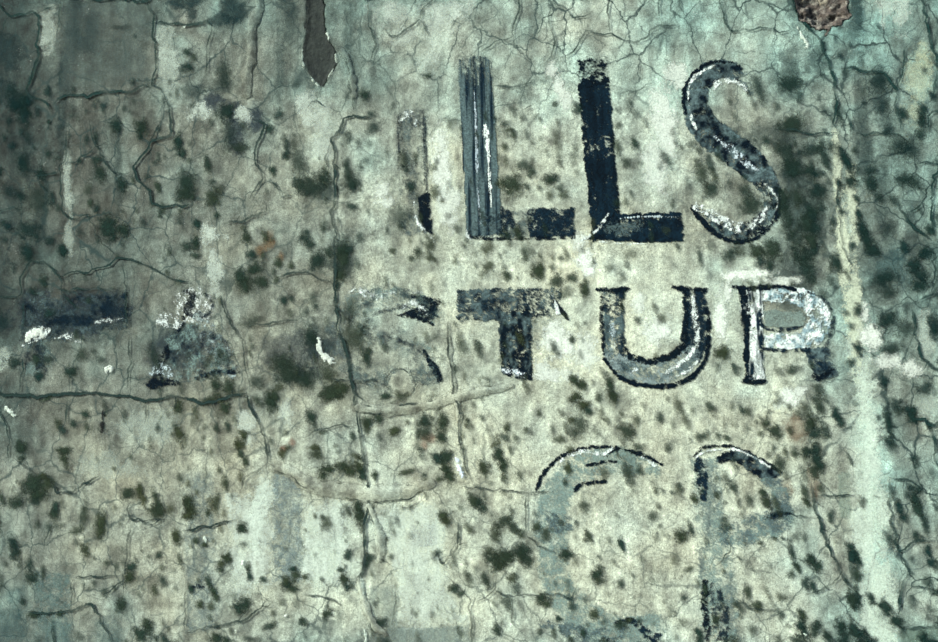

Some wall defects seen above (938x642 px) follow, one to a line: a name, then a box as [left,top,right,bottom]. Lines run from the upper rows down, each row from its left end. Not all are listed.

spalling [301,0,337,86]
crack [720,0,906,136]
spalling [795,0,852,48]
crack [0,0,306,488]
leakage [350,412,455,485]
crack [282,57,545,580]
leakage [479,226,597,297]
leakage [522,321,643,486]
leakage [712,72,938,642]
leakage [447,513,549,611]
crack [778,488,852,593]
crack [887,478,934,630]